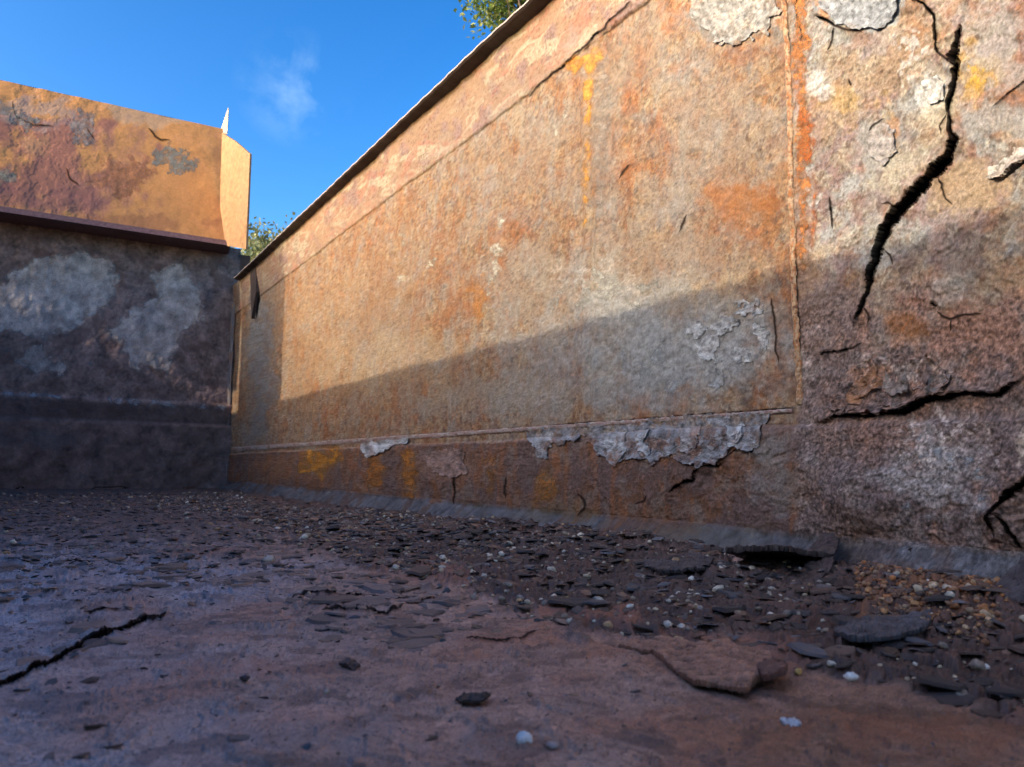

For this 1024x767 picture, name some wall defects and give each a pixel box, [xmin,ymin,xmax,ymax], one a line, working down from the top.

peeling [687,0,782,46]
peeling [818,0,898,30]
corrosion [566,47,603,123]
corrosion [790,0,816,271]
crack [770,0,962,363]
peeling [986,147,1024,179]
leakage [0,252,118,374]
leakage [109,264,211,371]
crack [824,380,1019,420]
peeling [525,412,770,469]
crack [983,476,1024,550]
crack [0,606,166,688]